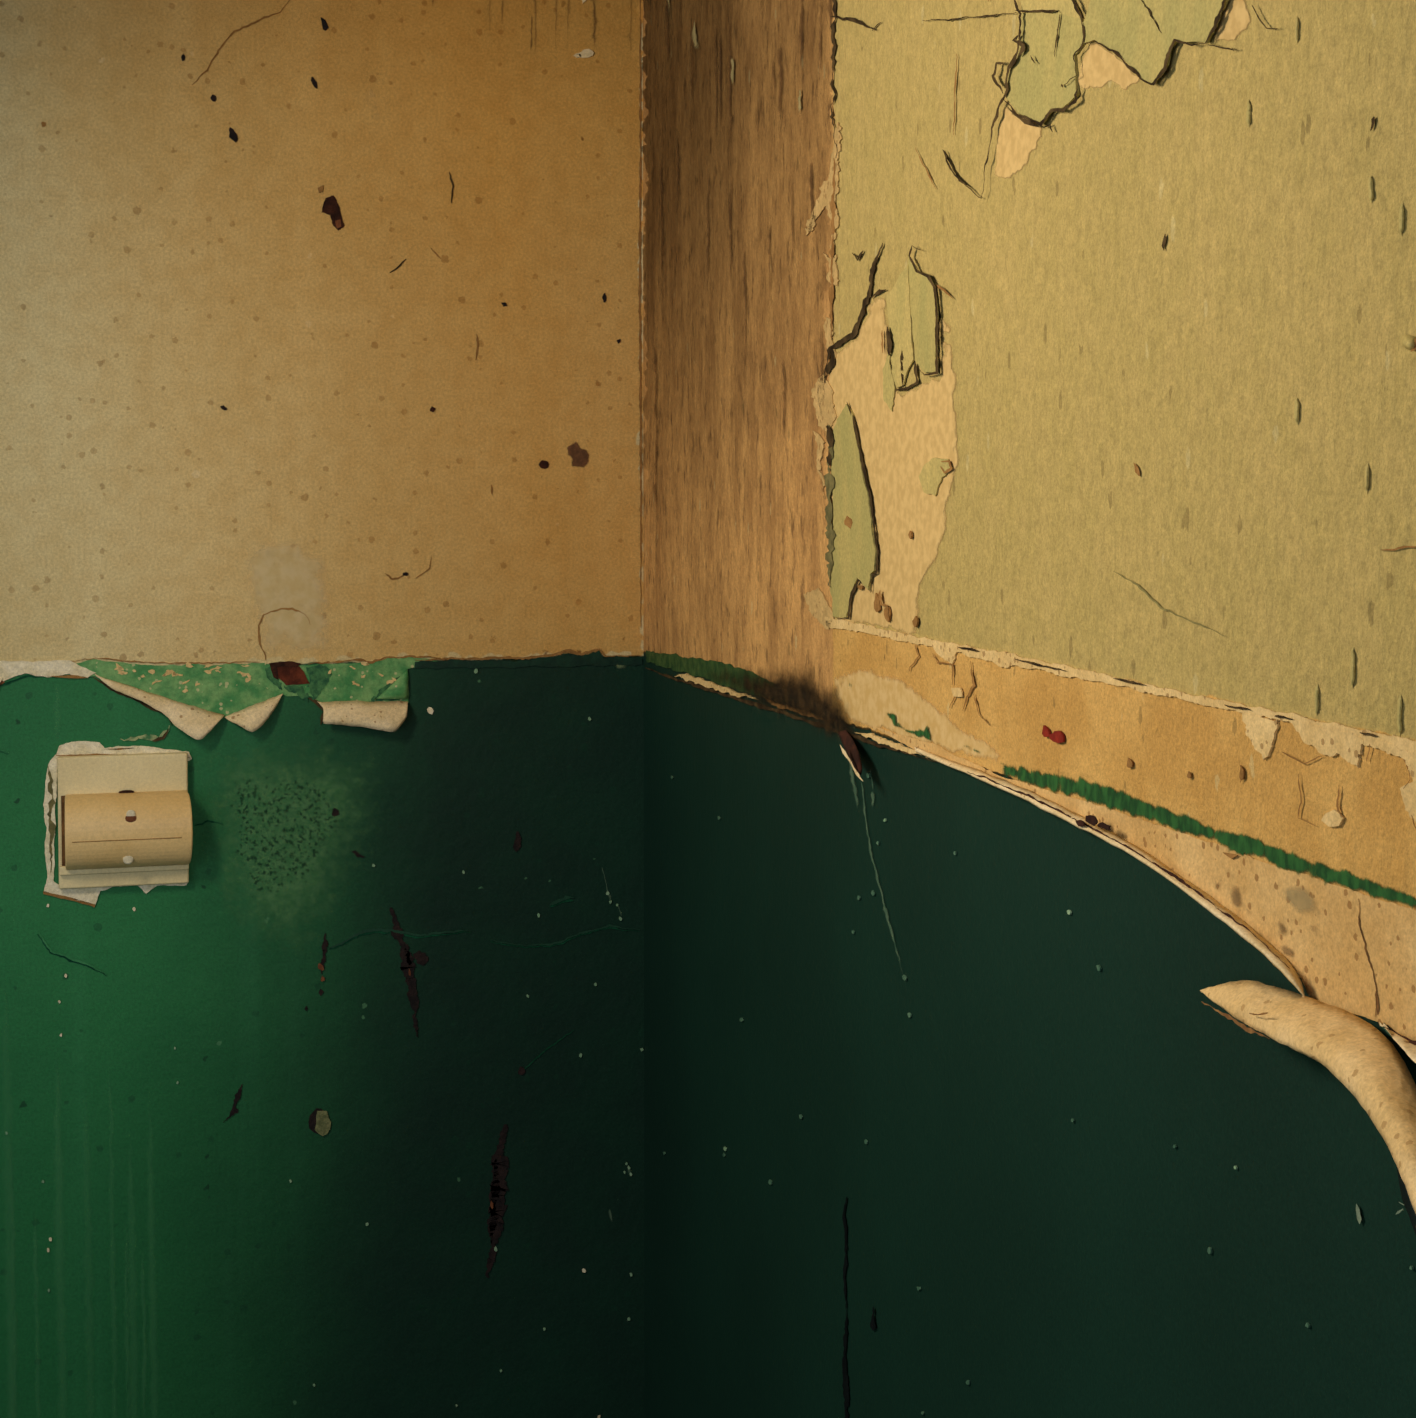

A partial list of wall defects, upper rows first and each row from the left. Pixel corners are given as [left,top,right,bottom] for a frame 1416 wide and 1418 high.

peeling [804,0,1416,822]
leakage [726,674,850,733]
leakage [231,777,337,890]
peeling [0,649,1416,1235]
crack [841,1197,849,1418]